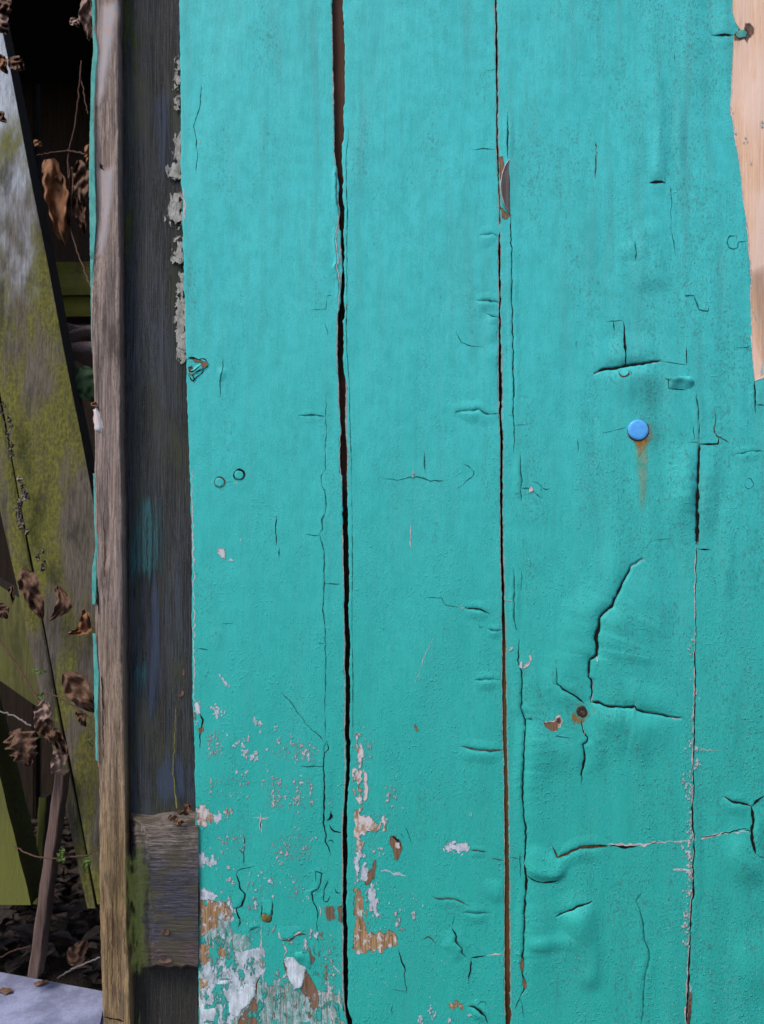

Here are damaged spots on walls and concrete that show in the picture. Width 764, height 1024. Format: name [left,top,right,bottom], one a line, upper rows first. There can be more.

peeling [172,55,181,111]
peeling [164,131,194,375]
peeling [730,0,764,381]
rust [627,421,649,455]
peeling [194,700,320,827]
peeling [198,770,344,1024]
peeling [325,727,423,955]
crack [424,320,764,1024]